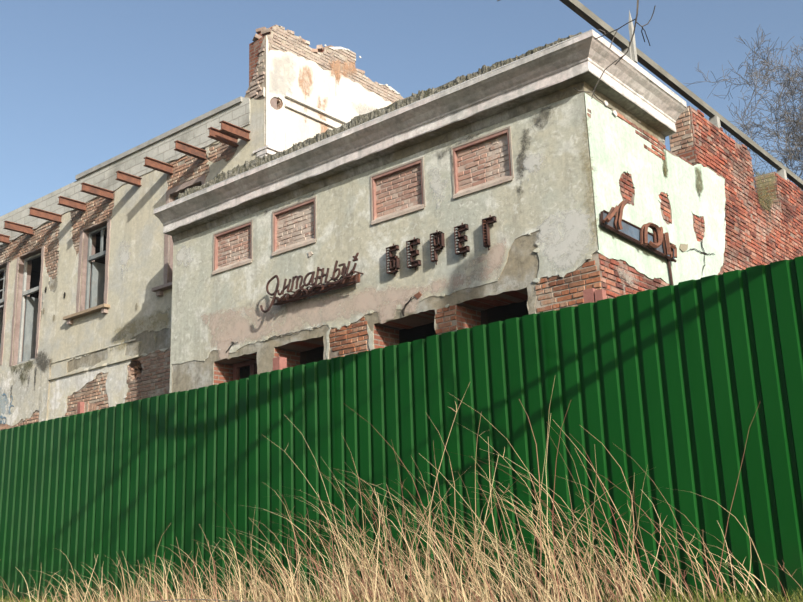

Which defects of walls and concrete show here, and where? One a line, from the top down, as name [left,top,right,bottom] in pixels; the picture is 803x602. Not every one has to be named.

spalling [244,26,404,103]
spalling [619,169,636,206]
spalling [658,191,672,224]
peeling [123,209,602,402]
spalling [64,349,109,417]
spalling [0,410,39,431]